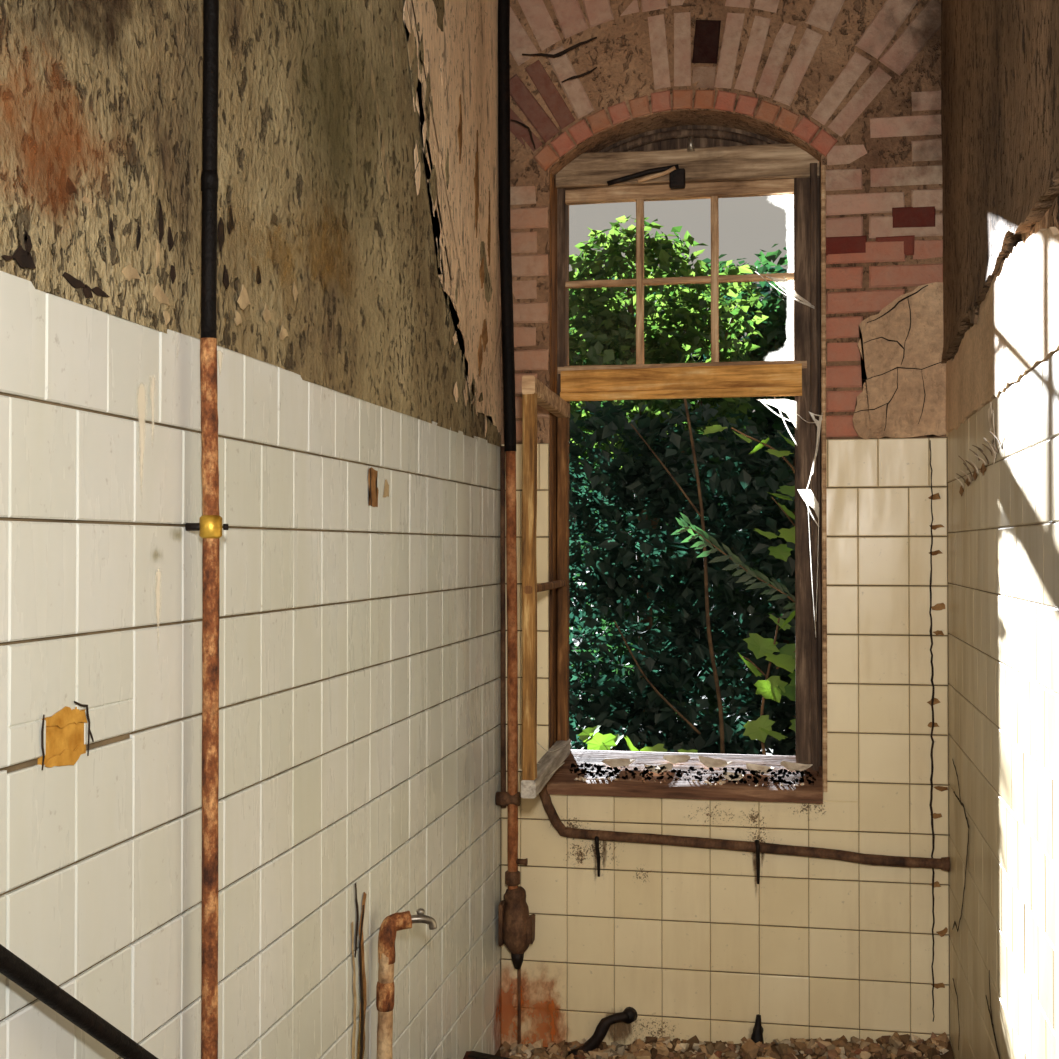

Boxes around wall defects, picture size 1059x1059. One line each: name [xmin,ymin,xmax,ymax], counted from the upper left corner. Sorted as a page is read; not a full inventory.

spalling [522,37,597,58]
flaking render [941,0,1059,496]
crack [852,282,946,439]
peeling [38,701,94,770]
corrosion [494,980,565,1047]